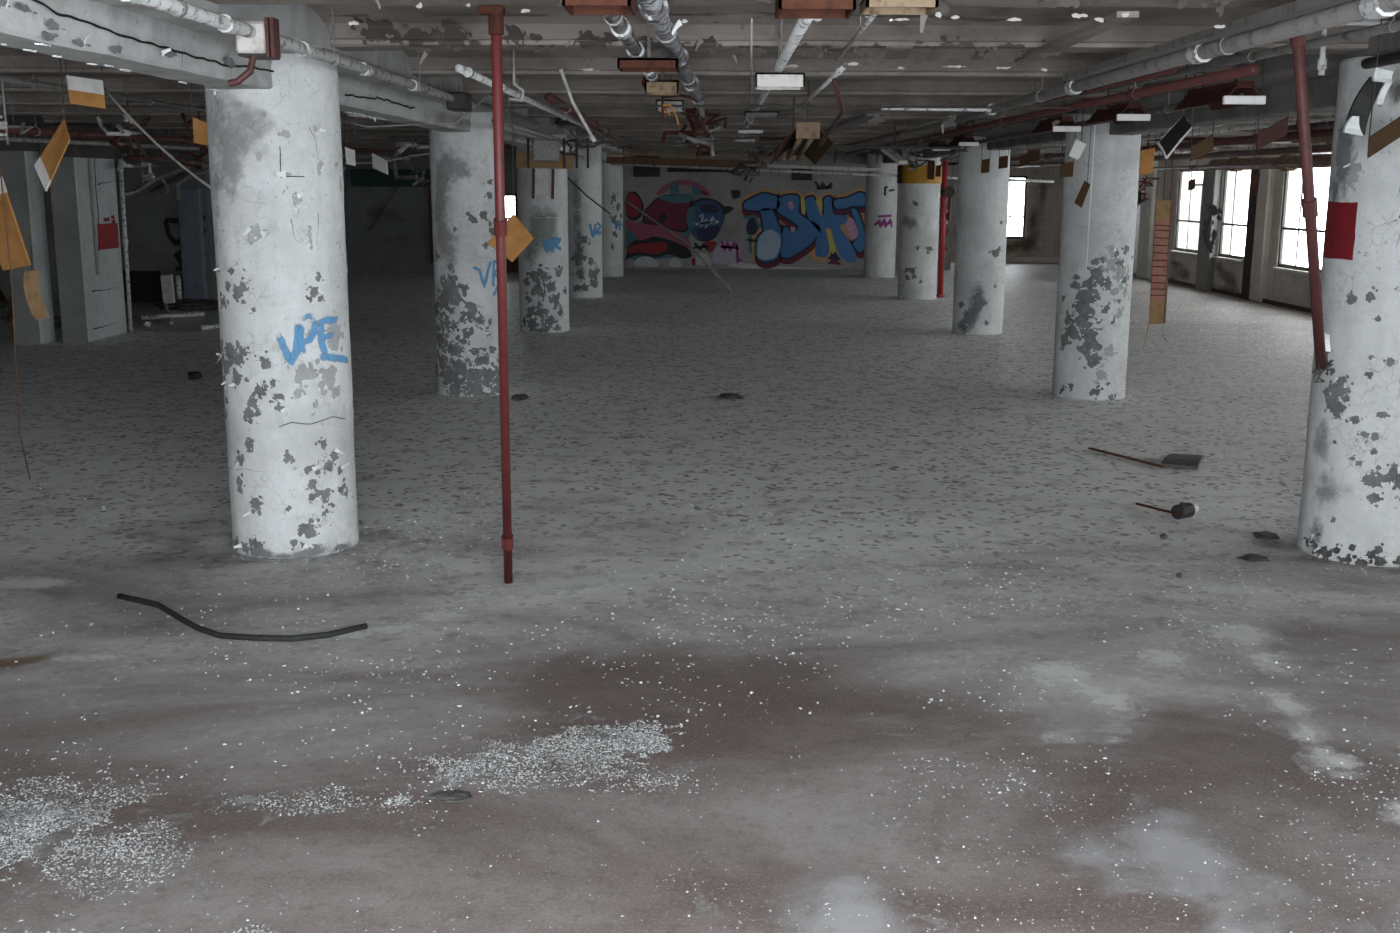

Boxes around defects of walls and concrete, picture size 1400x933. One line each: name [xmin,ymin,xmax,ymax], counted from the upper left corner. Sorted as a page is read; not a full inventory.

peeling [349,0,482,64]
peeling [502,9,771,71]
peeling [214,266,256,314]
peeling [305,271,325,303]
peeling [434,249,499,397]
peeling [521,233,600,333]
peeling [1059,244,1133,401]
peeling [216,316,344,517]
peeling [1323,355,1400,511]
peeling [283,437,349,552]
spalling [1304,515,1400,567]
damp [809,883,887,933]